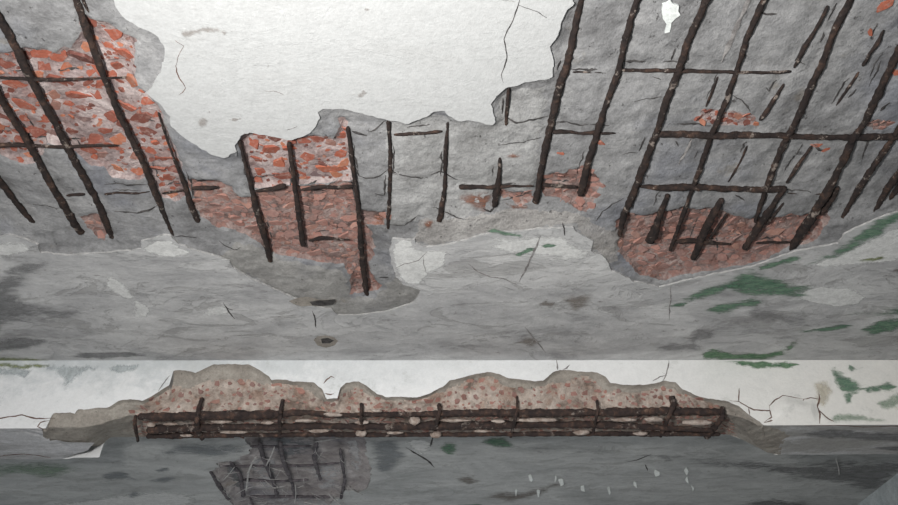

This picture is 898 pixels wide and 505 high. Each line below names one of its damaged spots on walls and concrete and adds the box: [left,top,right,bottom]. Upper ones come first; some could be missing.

crack [501,0,545,81]
spalling [0,0,898,317]
rust [464,195,489,208]
water stain [761,257,799,269]
water stain [670,281,742,307]
water stain [707,299,781,318]
water stain [862,320,898,334]
water stain [734,361,799,369]
water stain [863,382,898,407]
crack [736,388,898,427]
spalling [42,364,791,505]